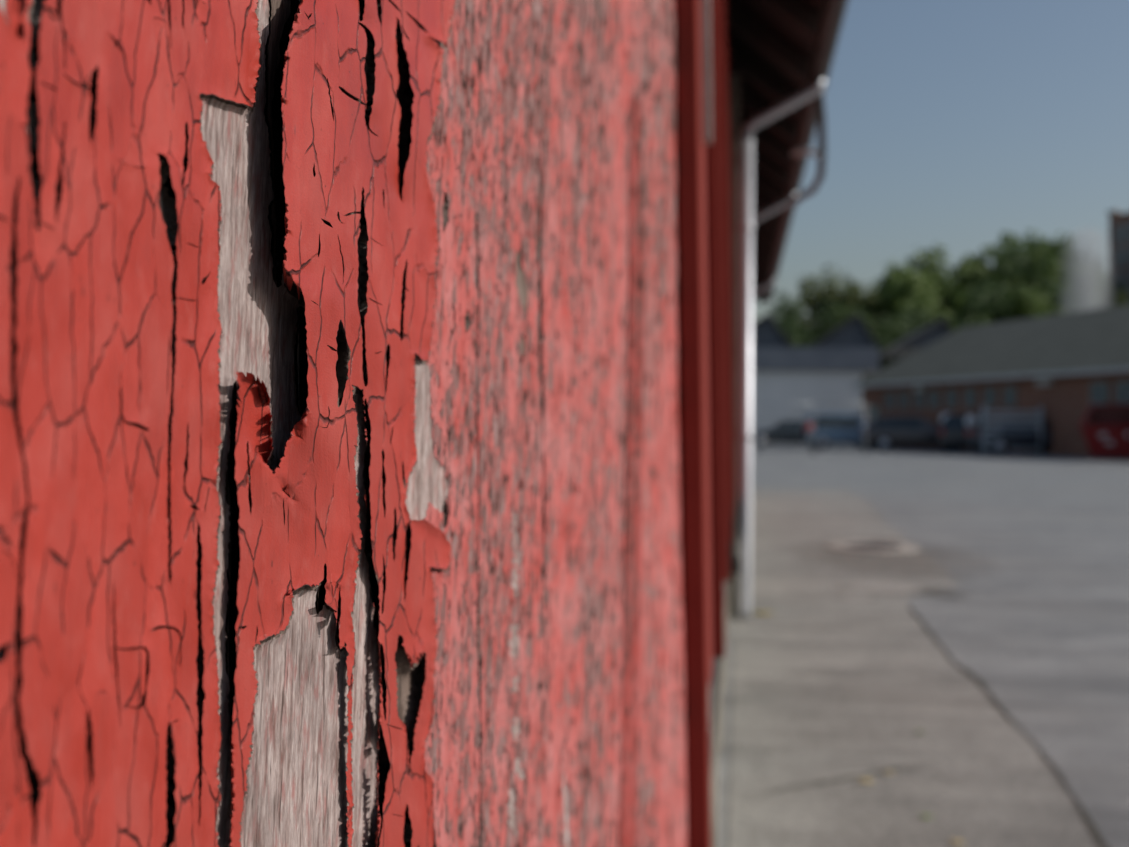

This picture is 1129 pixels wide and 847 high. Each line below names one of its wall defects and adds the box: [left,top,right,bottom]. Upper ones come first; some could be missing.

peeling [0,0,29,39]
crack [319,0,423,399]
crack [442,194,480,356]
crack [10,0,98,847]
crack [159,139,206,847]
peeling [200,0,430,847]
crack [378,432,411,618]
peeling [405,357,449,520]
crack [441,504,449,526]
crack [515,130,545,607]
crack [375,650,409,805]
crack [375,822,413,847]